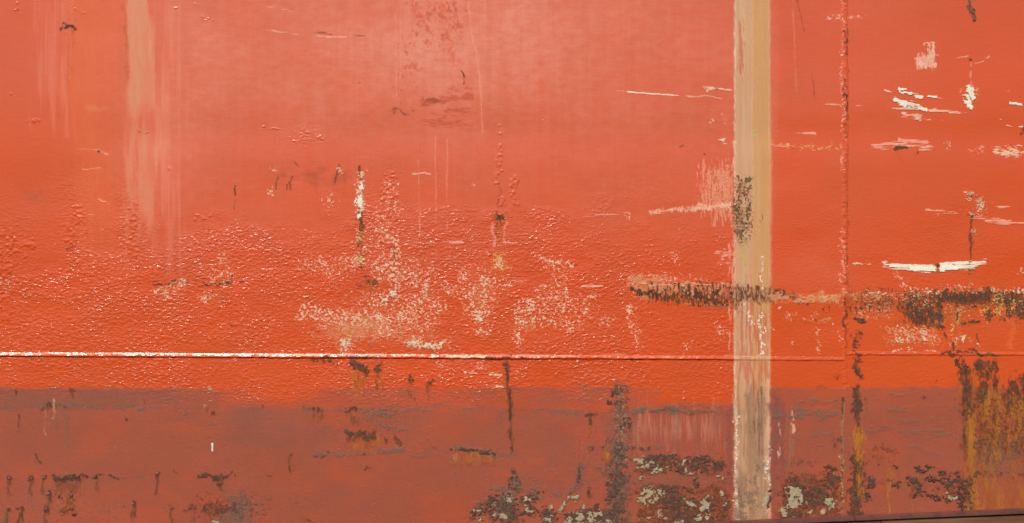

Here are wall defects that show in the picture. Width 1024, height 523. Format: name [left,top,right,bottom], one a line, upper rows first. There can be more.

peeling [885,87,954,121]
peeling [961,84,976,110]
corrosion [731,175,763,263]
corrosion [630,191,1024,329]
peeling [889,261,986,272]
corrosion [28,473,119,523]
corrosion [169,471,237,523]
corrosion [310,355,401,451]
corrosion [482,355,525,450]
corrosion [469,413,615,523]
corrosion [631,431,732,523]
corrosion [865,350,1024,514]